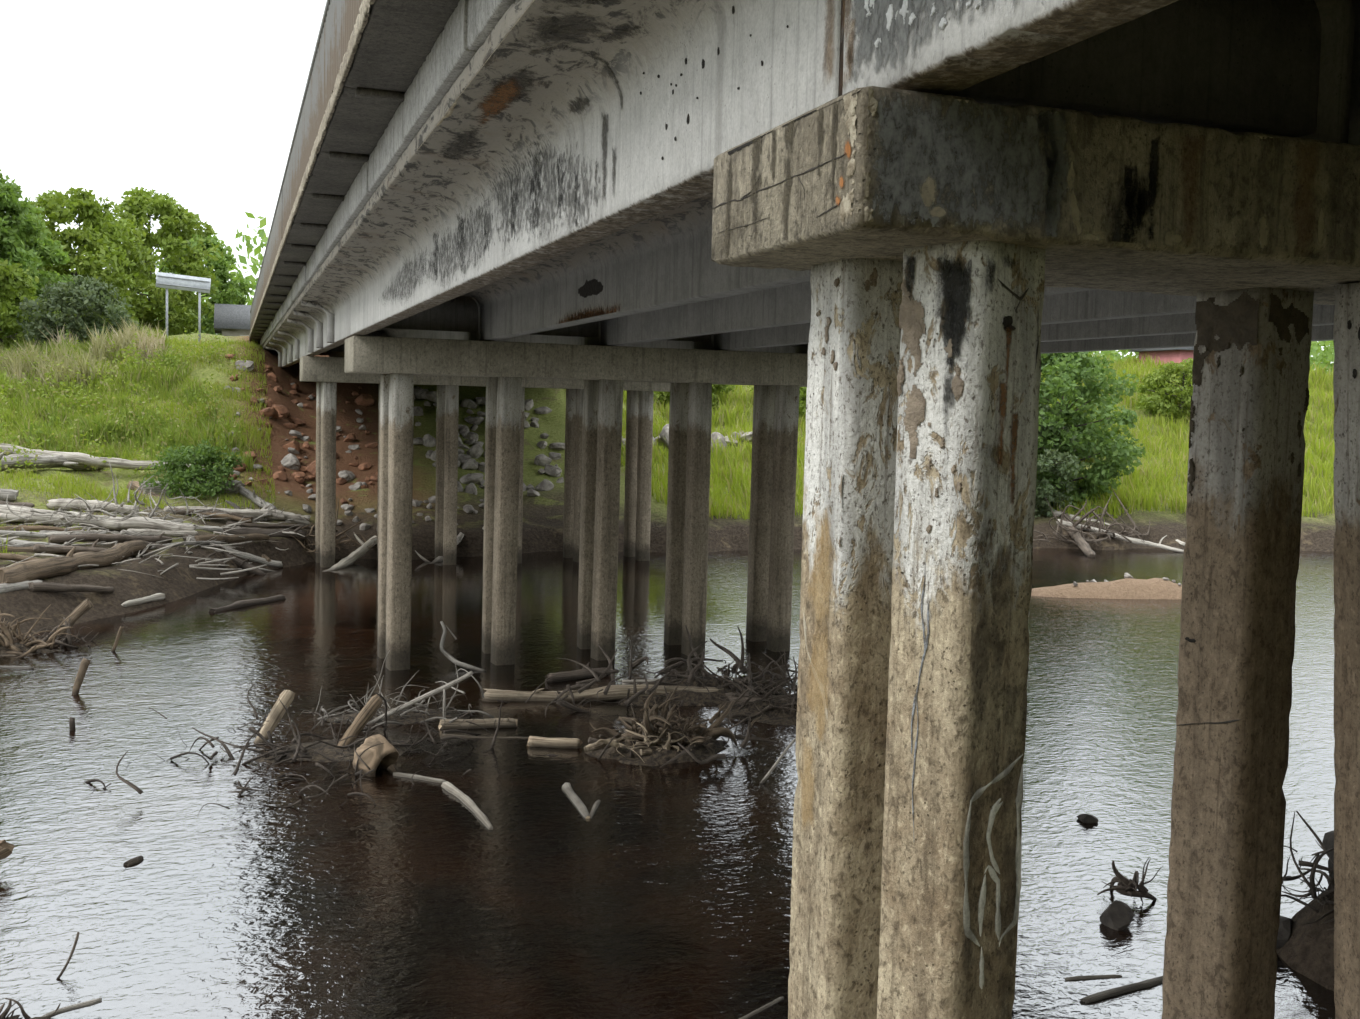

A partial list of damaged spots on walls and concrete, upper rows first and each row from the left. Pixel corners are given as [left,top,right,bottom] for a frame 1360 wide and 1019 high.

water stain [842,0,993,80]
water stain [378,0,641,305]
water stain [872,93,1182,246]
water stain [905,256,916,301]
water stain [936,255,1015,419]
peeling [1187,292,1310,496]
crack [911,563,929,833]